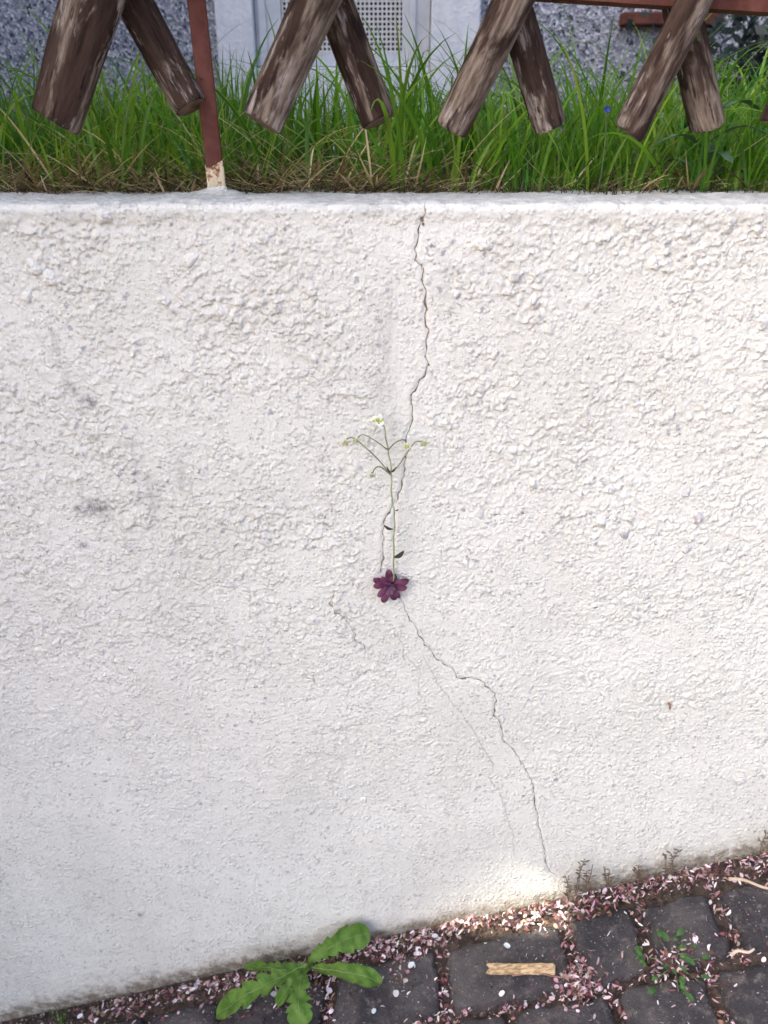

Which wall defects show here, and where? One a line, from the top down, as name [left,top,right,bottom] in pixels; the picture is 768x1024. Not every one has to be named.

crack [380,205,430,572]
crack [317,598,558,877]